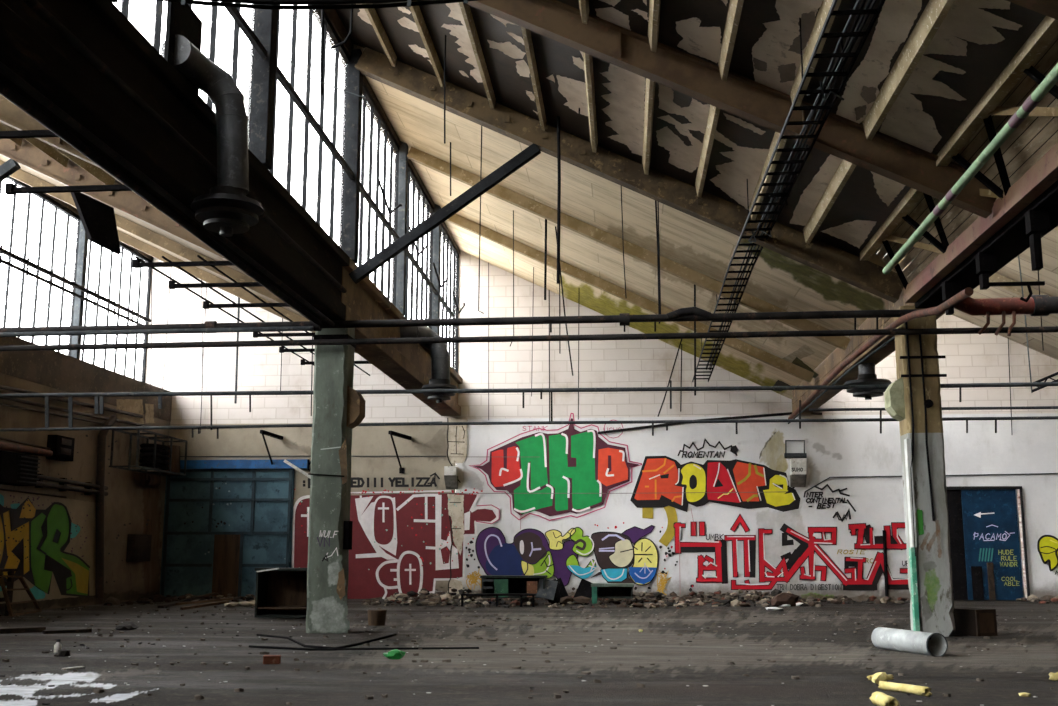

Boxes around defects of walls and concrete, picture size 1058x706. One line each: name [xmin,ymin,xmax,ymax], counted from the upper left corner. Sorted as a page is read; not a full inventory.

peeling [397,7,432,64]
peeling [441,2,483,83]
peeling [487,14,530,77]
peeling [546,51,588,116]
peeling [676,17,721,63]
peeling [751,0,823,95]
peeling [836,0,922,123]
peeling [879,0,1022,153]
peeling [601,63,769,209]
peeling [790,154,842,226]
peeling [821,220,877,248]
damp [598,214,799,358]